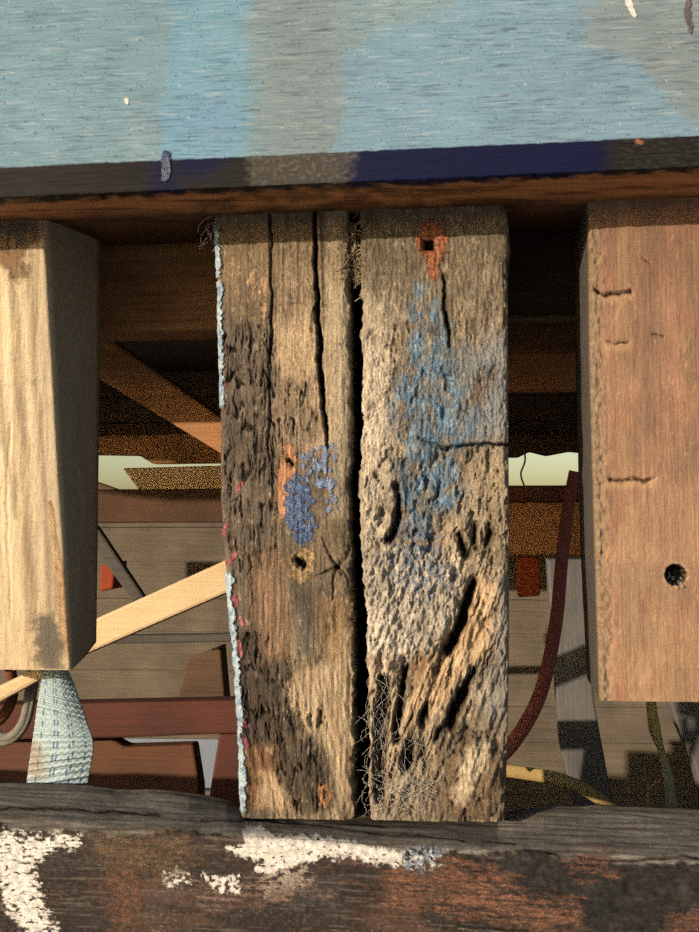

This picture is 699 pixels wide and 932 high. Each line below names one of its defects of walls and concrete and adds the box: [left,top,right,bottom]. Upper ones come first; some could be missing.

corrosion [684,0,693,34]
corrosion [416,219,448,281]
crack [595,289,631,297]
crack [224,214,329,562]
crack [420,438,509,451]
crack [322,217,371,815]
crack [243,634,317,775]